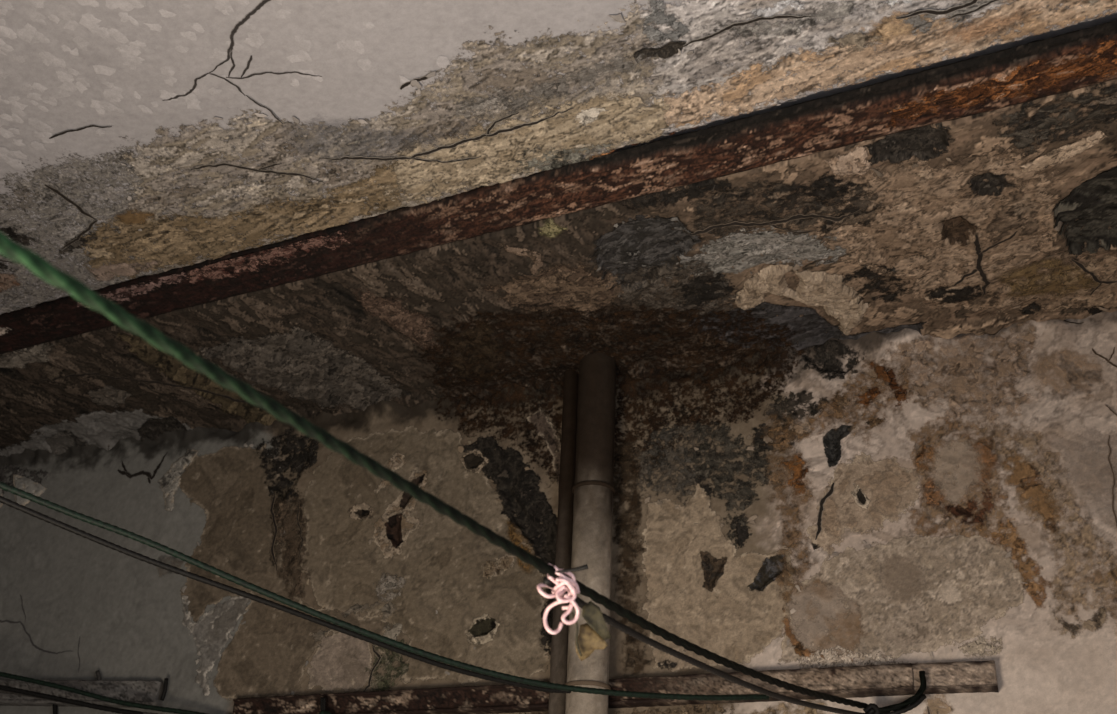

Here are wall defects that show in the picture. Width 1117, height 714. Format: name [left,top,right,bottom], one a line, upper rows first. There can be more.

crack [49,125,112,139]
crack [162,0,322,124]
flaking render [0,0,1114,303]
crack [683,15,814,47]
crack [896,0,998,19]
corrosion [886,40,1117,128]
flaking render [589,122,1117,350]
mould [841,264,908,304]
flaking render [199,327,411,411]
damp [353,255,864,674]
flaking render [158,425,557,700]
flaking render [638,418,1031,672]